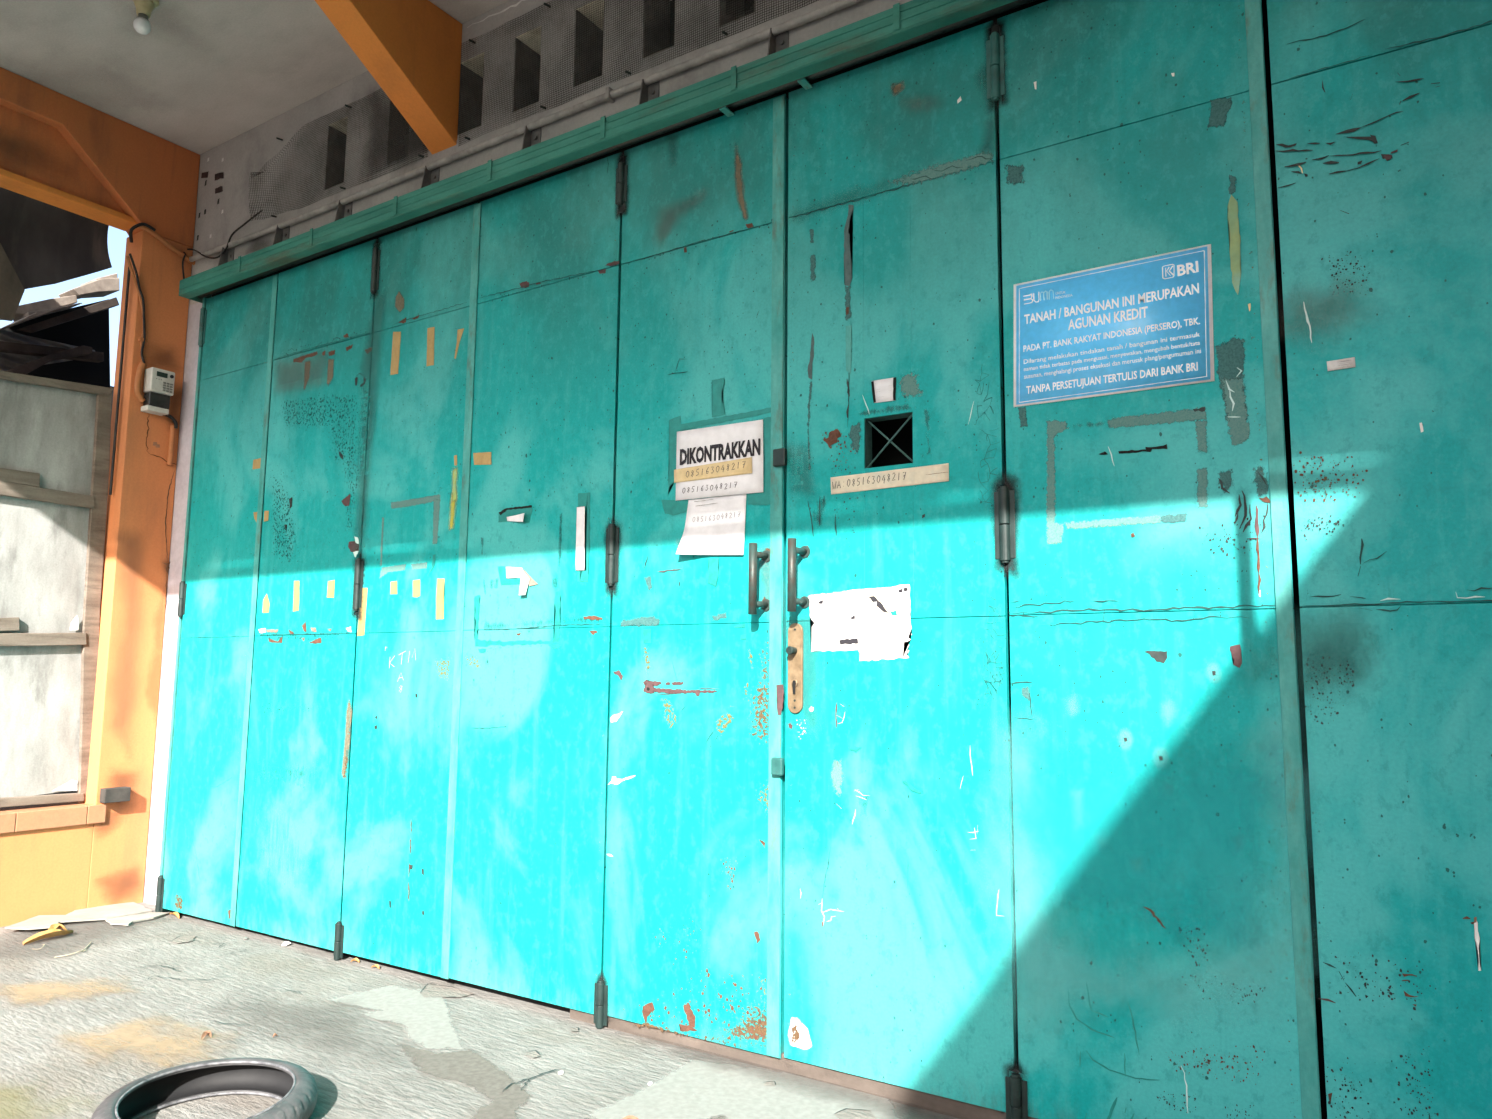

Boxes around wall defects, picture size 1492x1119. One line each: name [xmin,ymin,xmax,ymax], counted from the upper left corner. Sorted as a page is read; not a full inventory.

corrosion [643,663,718,710]
corrosion [746,642,784,744]
peeling [332,984,531,1119]
corrosion [623,968,767,1050]
peeling [585,1060,899,1119]
peeling [788,1018,812,1049]